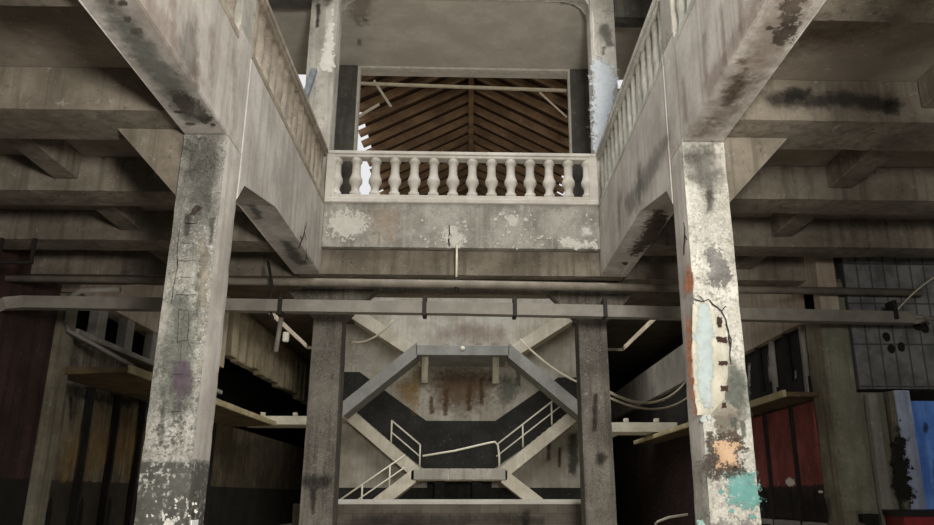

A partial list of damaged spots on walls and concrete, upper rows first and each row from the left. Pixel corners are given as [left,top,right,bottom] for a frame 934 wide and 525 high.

peeling [319,8,336,73]
peeling [587,46,620,153]
damp [769,89,897,113]
peeling [322,207,371,243]
peeling [420,220,468,249]
peeling [494,210,598,251]
crack [692,295,732,361]
spalling [693,303,762,525]
peeling [146,498,198,525]